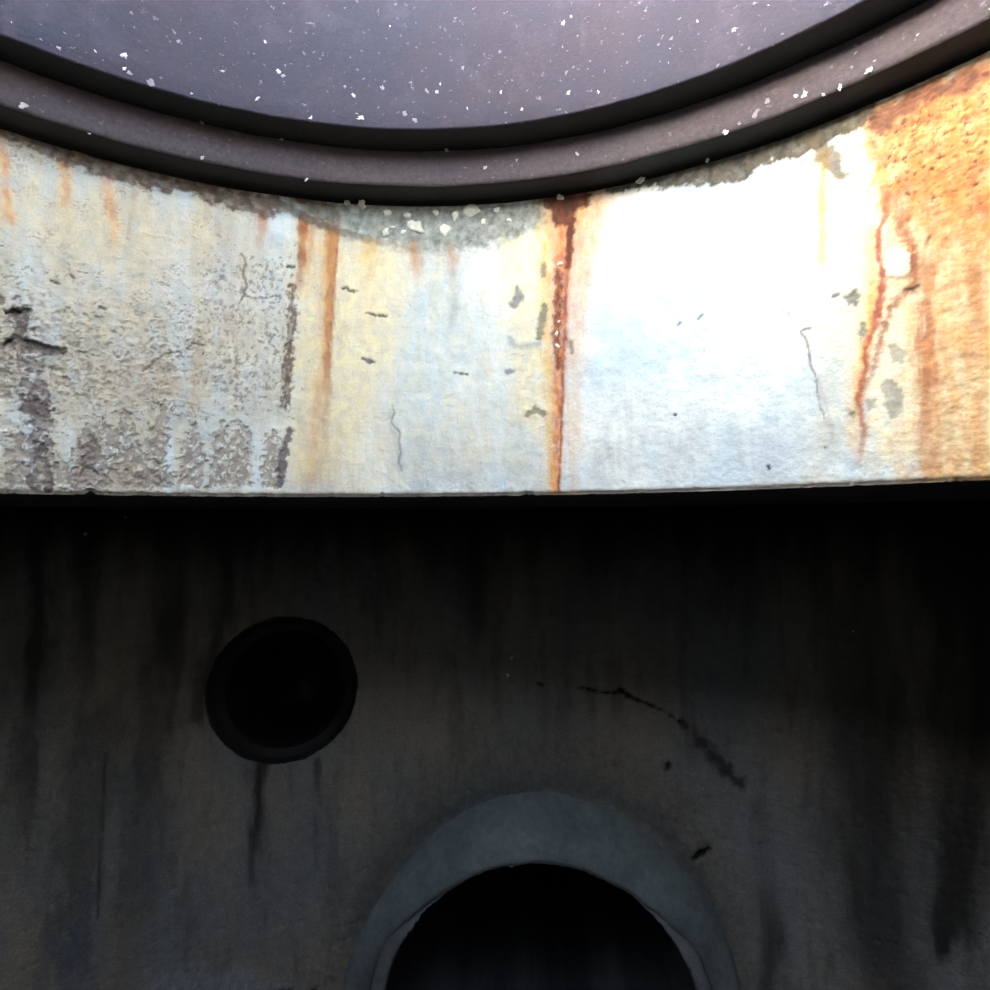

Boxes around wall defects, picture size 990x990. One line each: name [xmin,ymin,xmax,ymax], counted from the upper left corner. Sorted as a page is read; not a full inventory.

peeling [0,238,319,494]
leakage [0,137,542,497]
corrosion [292,220,468,494]
corrosion [528,188,646,495]
leakage [587,135,899,494]
crack [766,295,838,443]
corrosion [840,51,990,484]
leakage [0,500,990,990]
crack [575,685,753,797]